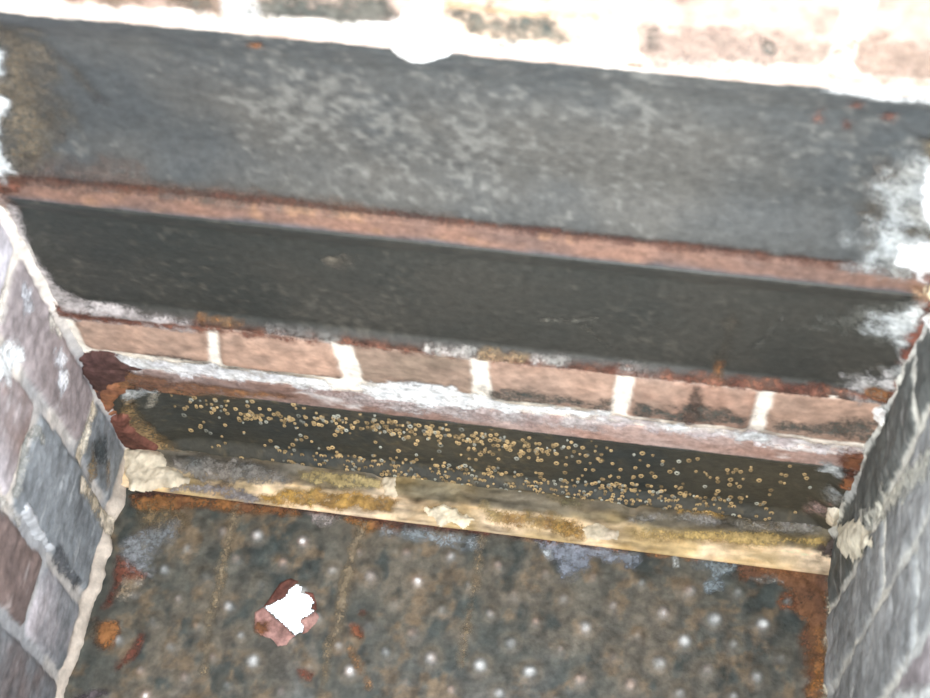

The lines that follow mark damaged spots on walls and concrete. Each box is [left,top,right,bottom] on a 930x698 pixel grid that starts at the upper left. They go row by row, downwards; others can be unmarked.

corrosion [0,151,930,361]
efflorescence [845,140,930,284]
efflorescence [813,300,930,408]
corrosion [90,617,120,649]
corrosion [105,556,144,607]
water stain [117,354,865,692]
corrosion [727,563,829,698]